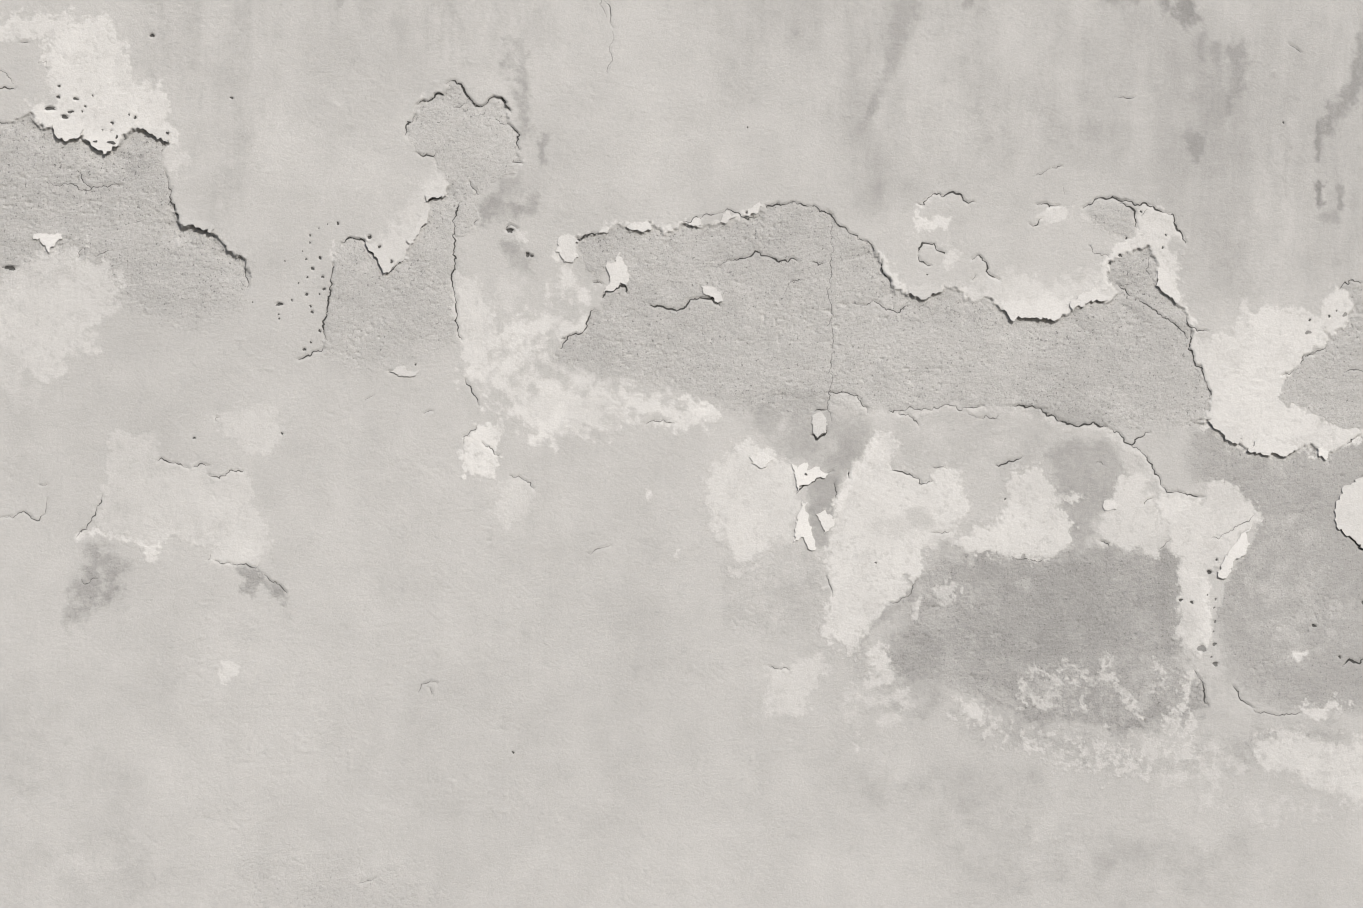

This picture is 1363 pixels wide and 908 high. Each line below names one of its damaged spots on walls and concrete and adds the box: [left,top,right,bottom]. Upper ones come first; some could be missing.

spalling [0,0,253,426]
spalling [276,80,1363,843]
damp [711,373,1363,908]